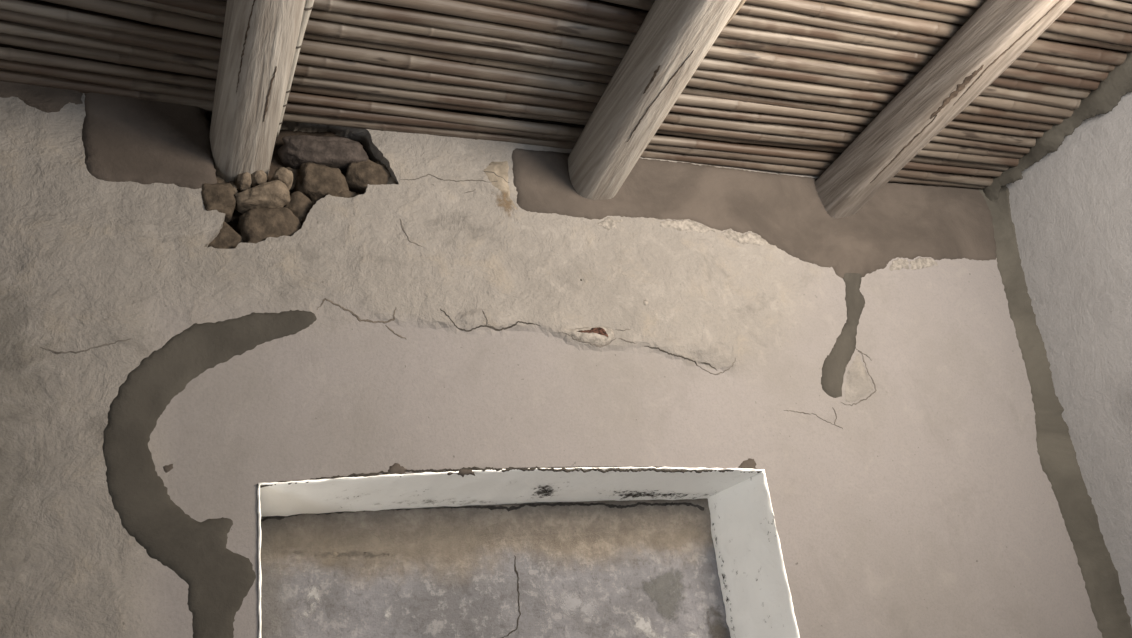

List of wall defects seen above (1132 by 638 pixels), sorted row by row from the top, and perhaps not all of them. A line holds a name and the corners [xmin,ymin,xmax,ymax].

spalling [201,129,396,249]
crack [317,298,406,339]
crack [440,309,736,375]